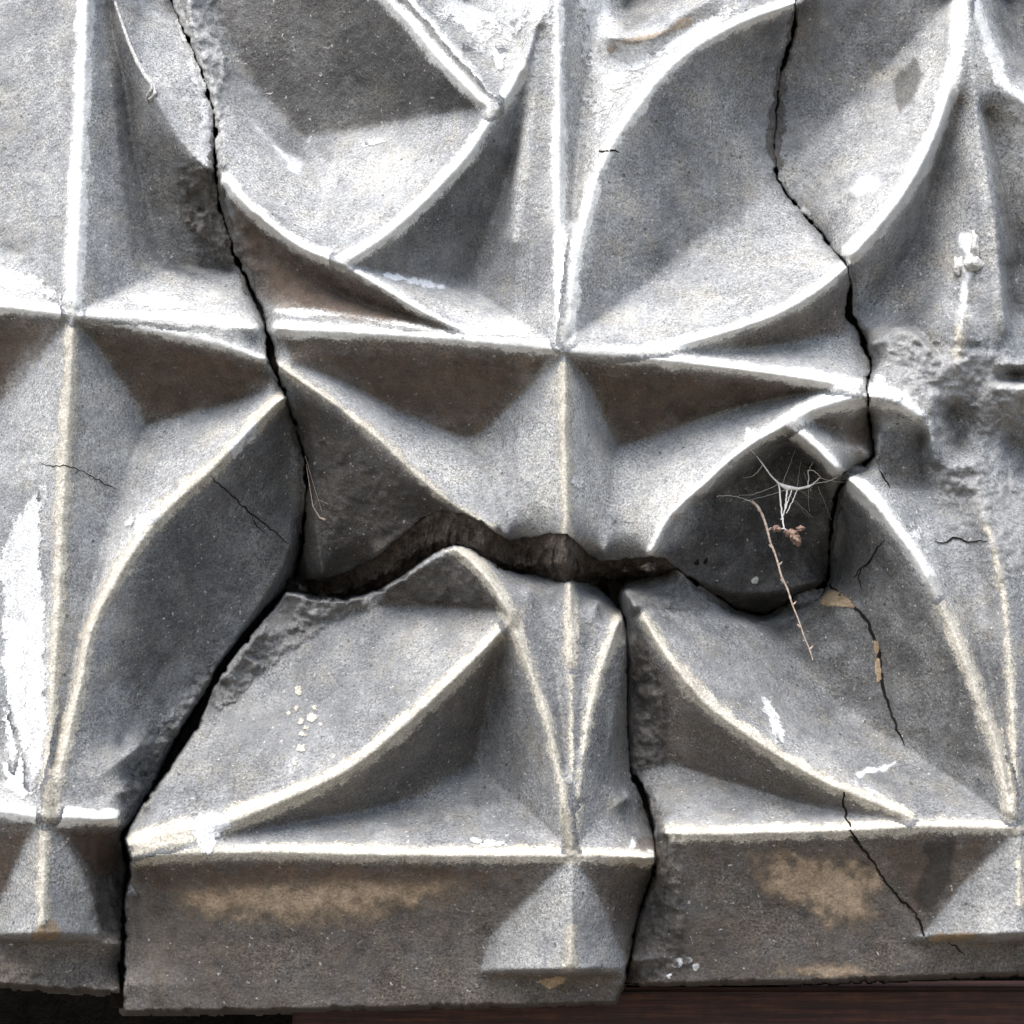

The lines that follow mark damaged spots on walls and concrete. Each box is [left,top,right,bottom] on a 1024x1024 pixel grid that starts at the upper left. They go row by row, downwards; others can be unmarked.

crack [173,0,286,395]
crack [686,10,905,745]
crack [40,462,115,489]
crack [935,536,986,544]
crack [145,419,308,801]
crack [607,578,626,624]
crack [631,773,654,832]
crack [111,829,130,1008]
leakage [754,851,883,927]